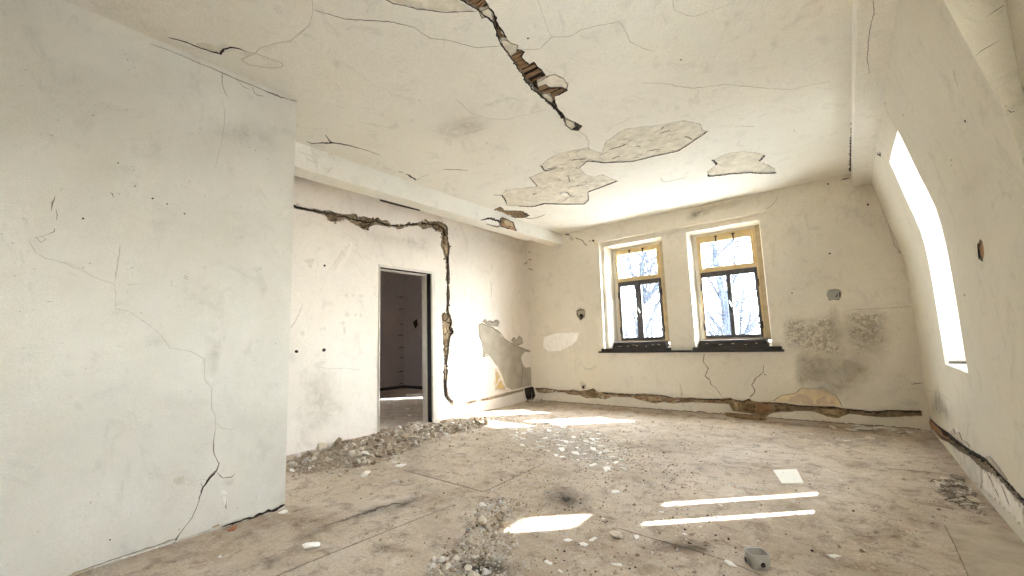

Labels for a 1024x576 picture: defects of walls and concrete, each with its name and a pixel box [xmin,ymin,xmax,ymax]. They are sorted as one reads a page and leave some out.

crack [154,0,655,166]
peeling [386,0,708,231]
peeling [707,151,776,177]
crack [28,240,285,576]
peeling [478,319,531,390]
crack [452,354,1024,528]
peeling [774,387,843,407]
peeling [930,474,987,514]